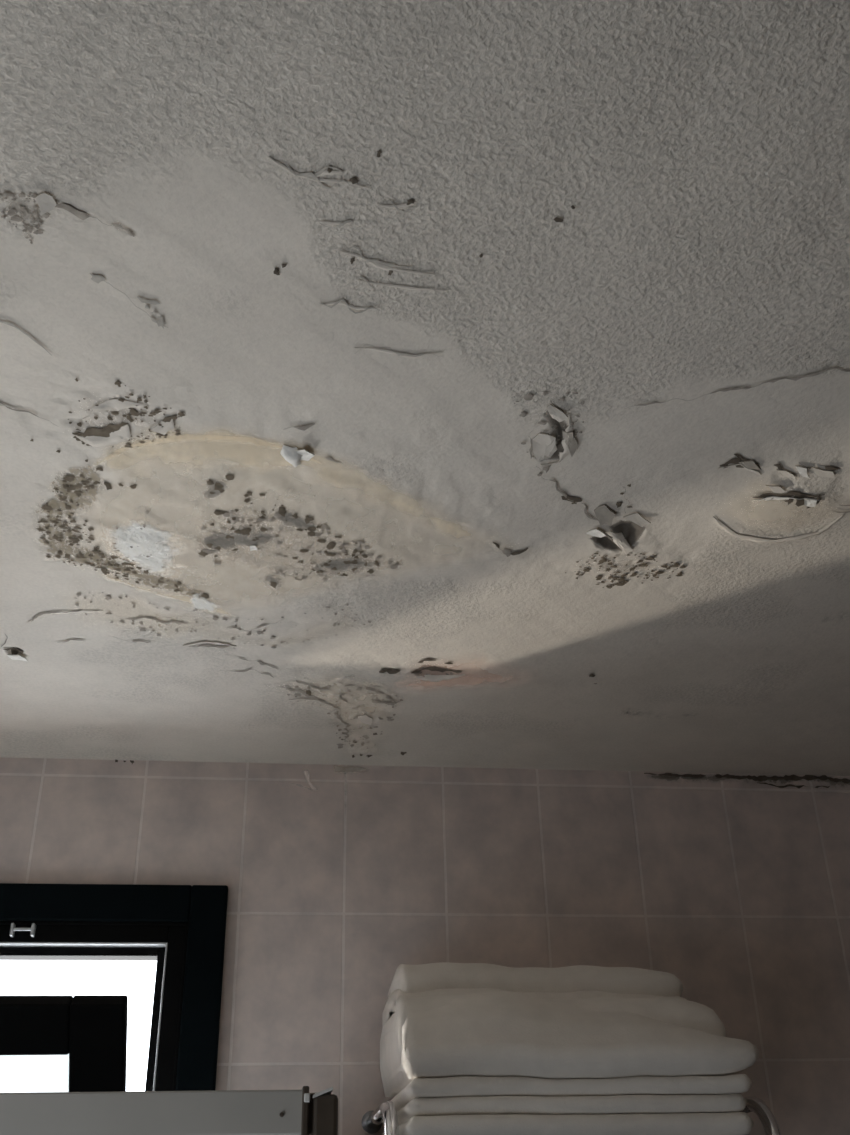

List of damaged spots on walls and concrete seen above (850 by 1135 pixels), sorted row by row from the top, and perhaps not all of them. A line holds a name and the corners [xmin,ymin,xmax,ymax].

spalling [0,192,134,244]
peeling [0,380,185,462]
water stain [36,466,217,612]
peeling [188,474,403,589]
water stain [493,542,528,557]
spalling [511,392,686,589]
peeling [774,463,840,481]
water stain [286,680,403,771]
crack [644,773,850,788]